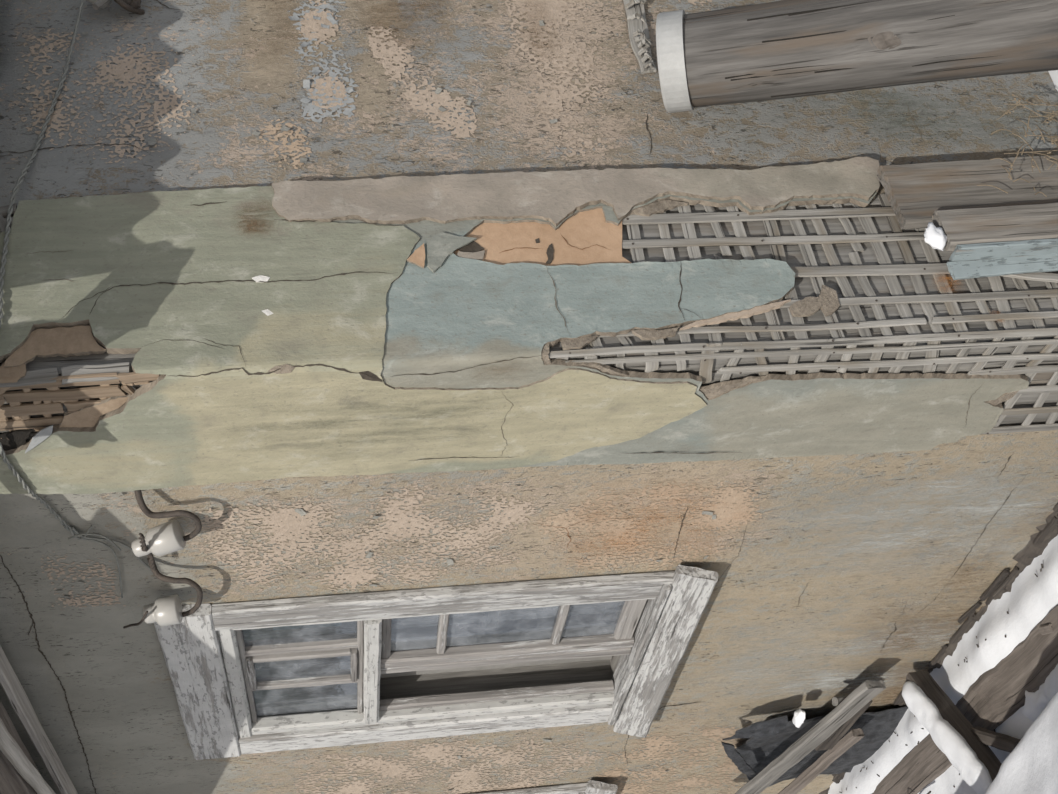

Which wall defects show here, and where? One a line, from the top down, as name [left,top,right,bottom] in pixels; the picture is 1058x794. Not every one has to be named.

spalling [407,200,688,273]
spalling [632,285,840,340]
spalling [0,325,160,453]
crack [178,339,535,381]
crack [0,555,97,794]